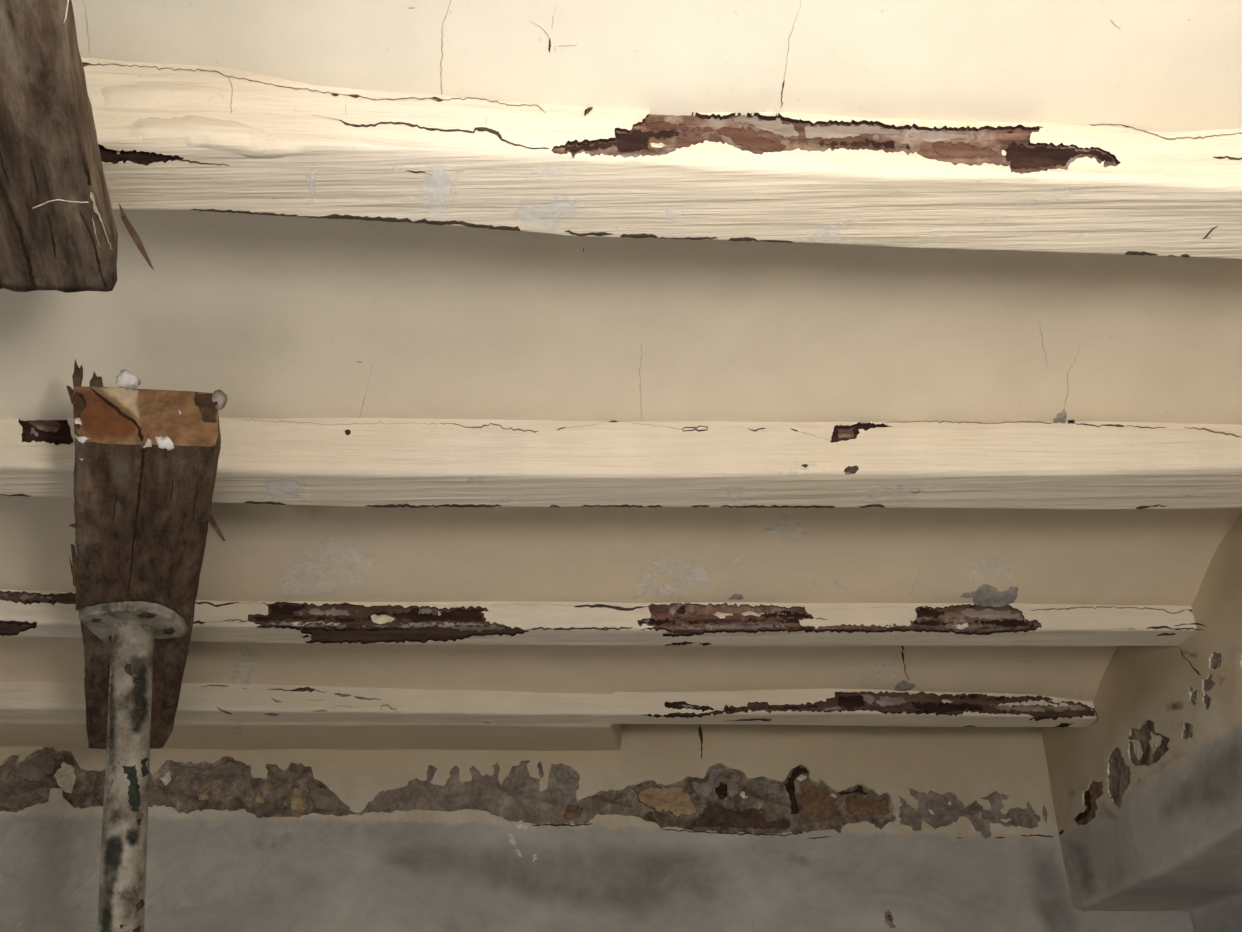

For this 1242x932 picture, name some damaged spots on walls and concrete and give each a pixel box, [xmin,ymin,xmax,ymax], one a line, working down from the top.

crack [82,0,549,149]
peeling [98,144,184,166]
peeling [551,112,1121,174]
crack [1089,124,1242,160]
peeling [830,422,890,443]
peeling [0,591,76,606]
peeling [0,620,37,636]
peeling [248,602,529,644]
peeling [637,602,1041,646]
peeling [644,691,1095,727]
peeling [123,757,149,825]
flaking render [1072,719,1194,826]